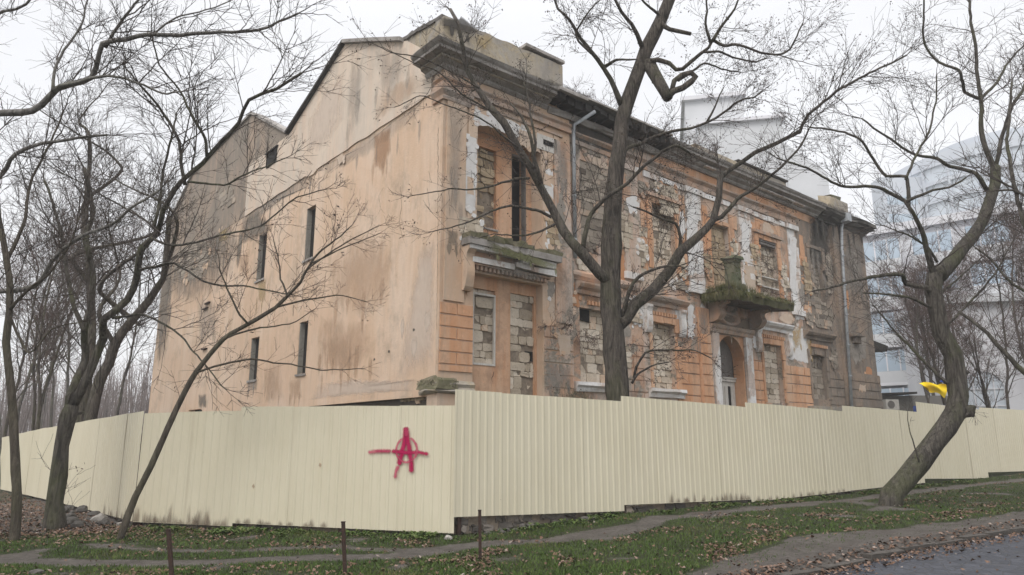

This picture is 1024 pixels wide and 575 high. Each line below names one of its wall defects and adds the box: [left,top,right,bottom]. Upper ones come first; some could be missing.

flaking render [459,106,608,323]
leakage [401,258,432,358]
peeling [553,329,571,356]
peeling [621,180,713,369]
peeling [829,332,872,392]